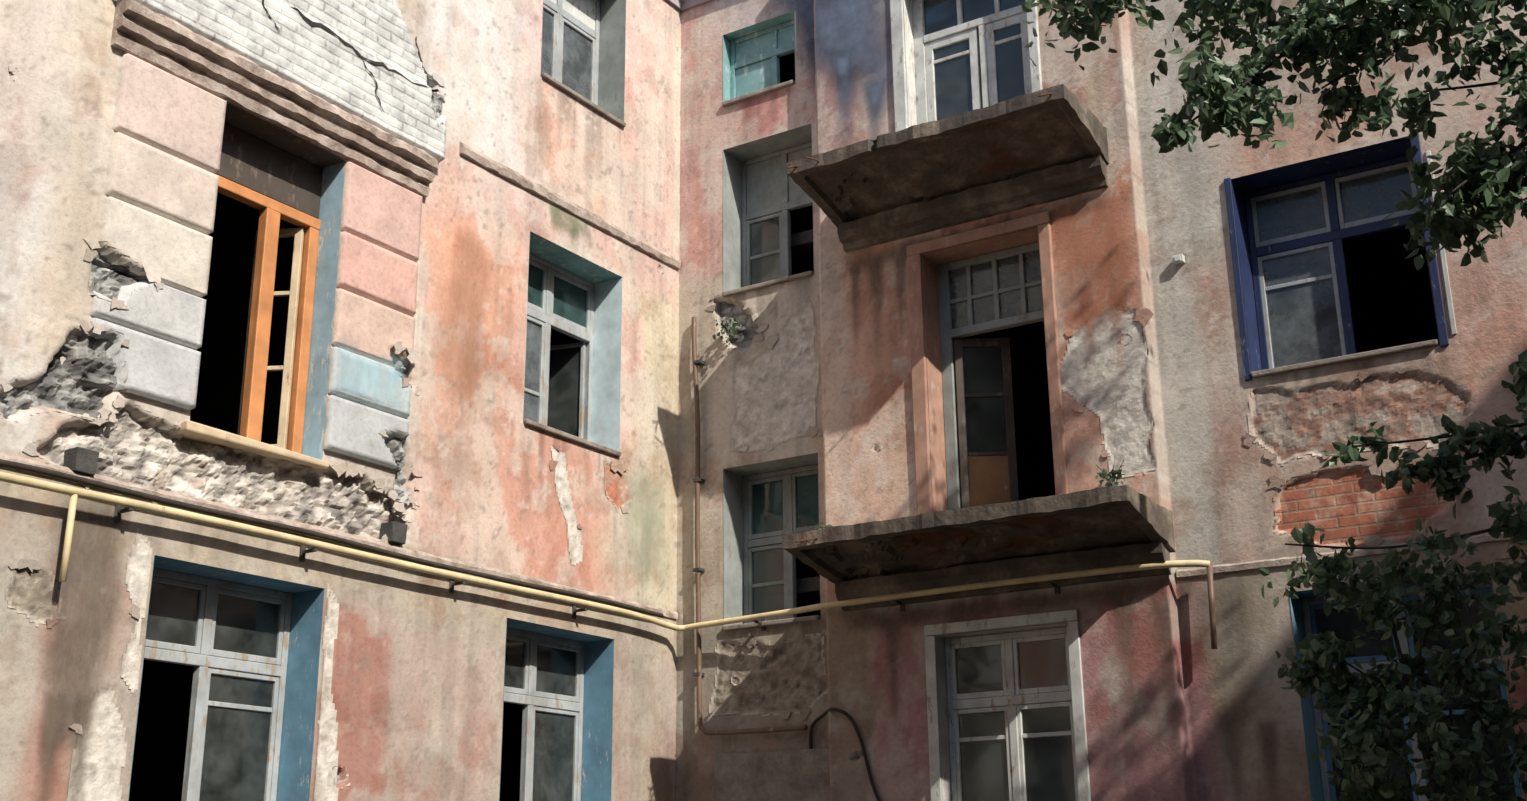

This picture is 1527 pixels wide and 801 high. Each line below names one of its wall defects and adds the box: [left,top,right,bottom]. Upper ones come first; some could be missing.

crack [262,0,440,113]
flaking render [83,234,165,310]
flaking render [0,320,424,545]
flaking render [549,443,583,565]
flaking render [706,295,823,453]
flaking render [1060,304,1156,478]
flaking render [1243,368,1475,547]
flaking render [5,559,66,628]
flaking render [67,528,153,801]
flaking render [314,583,350,801]